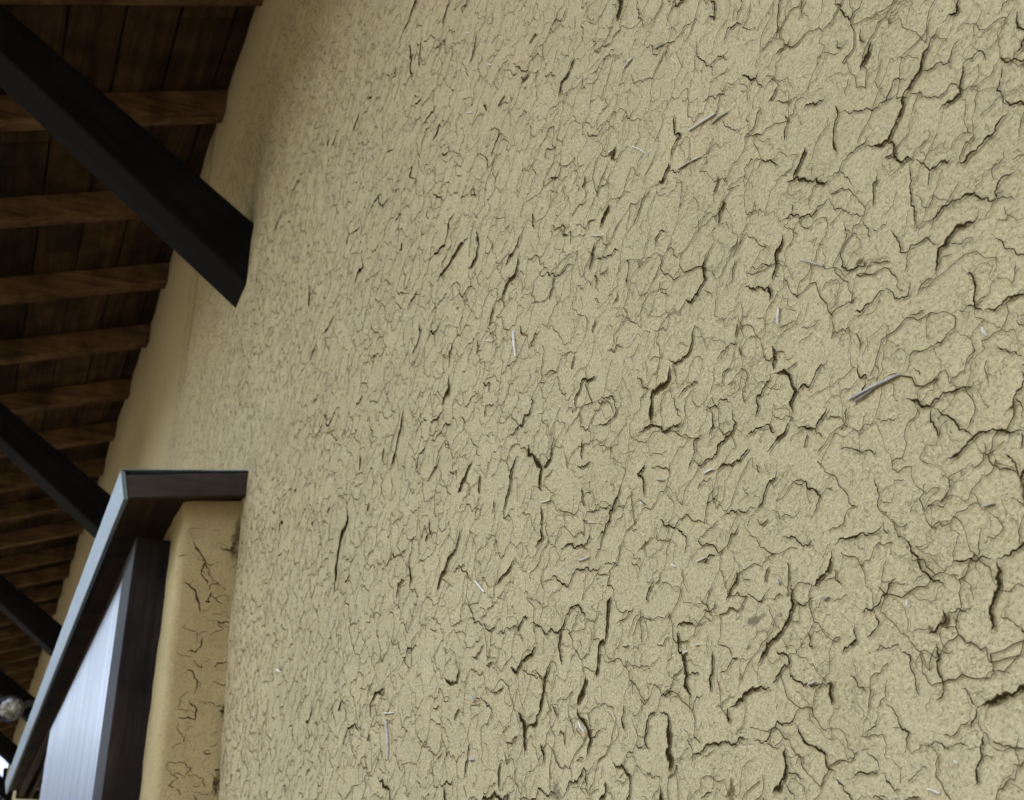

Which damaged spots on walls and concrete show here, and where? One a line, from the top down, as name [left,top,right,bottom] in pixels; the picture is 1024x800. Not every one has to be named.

crack [835,523,889,545]
crack [177,624,209,668]
crack [707,651,715,692]
crack [716,542,892,800]
crack [172,669,201,749]
crack [420,688,449,710]
crack [850,663,1024,800]
crack [166,761,209,800]